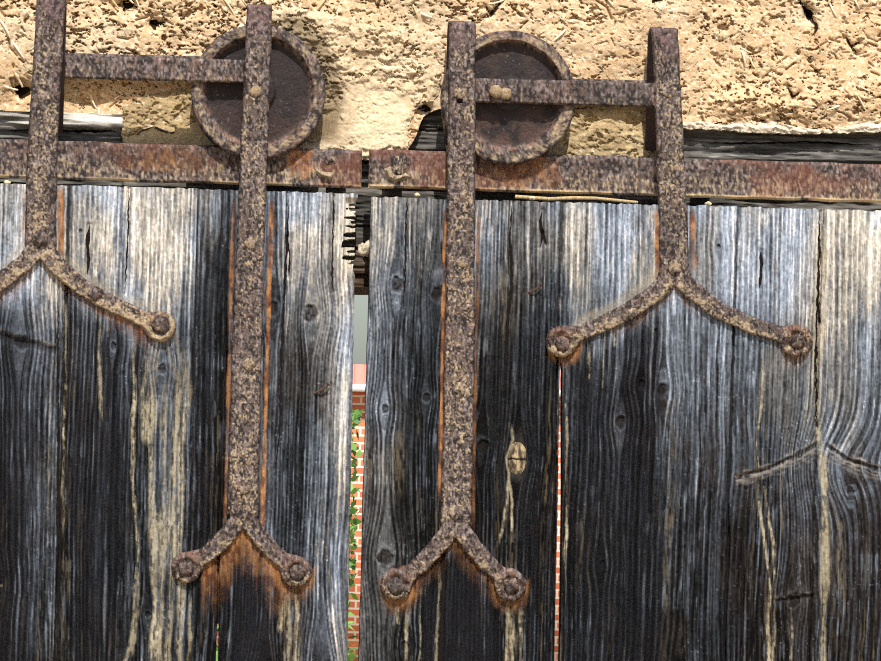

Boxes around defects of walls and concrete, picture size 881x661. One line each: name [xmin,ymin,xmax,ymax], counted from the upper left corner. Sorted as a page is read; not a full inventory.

crack [798,0,818,36]
corrosion [264,244,272,437]
corrosion [438,216,446,489]
corrosion [204,529,277,576]